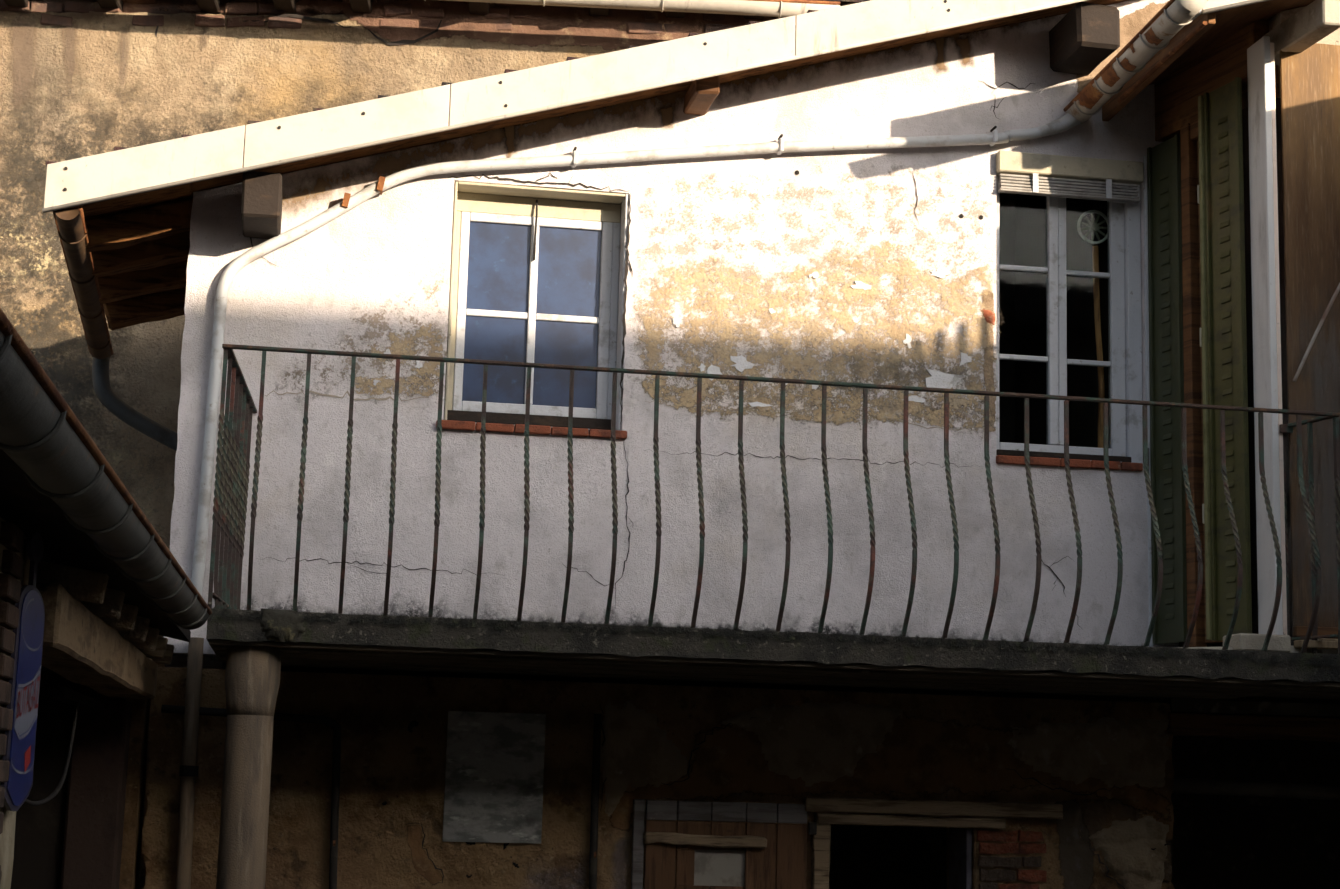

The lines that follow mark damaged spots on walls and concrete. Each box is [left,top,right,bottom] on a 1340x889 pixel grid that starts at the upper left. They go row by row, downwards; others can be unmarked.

damp [12,20,35,102]
peeling [276,281,448,397]
peeling [634,169,997,432]
crack [256,557,498,575]